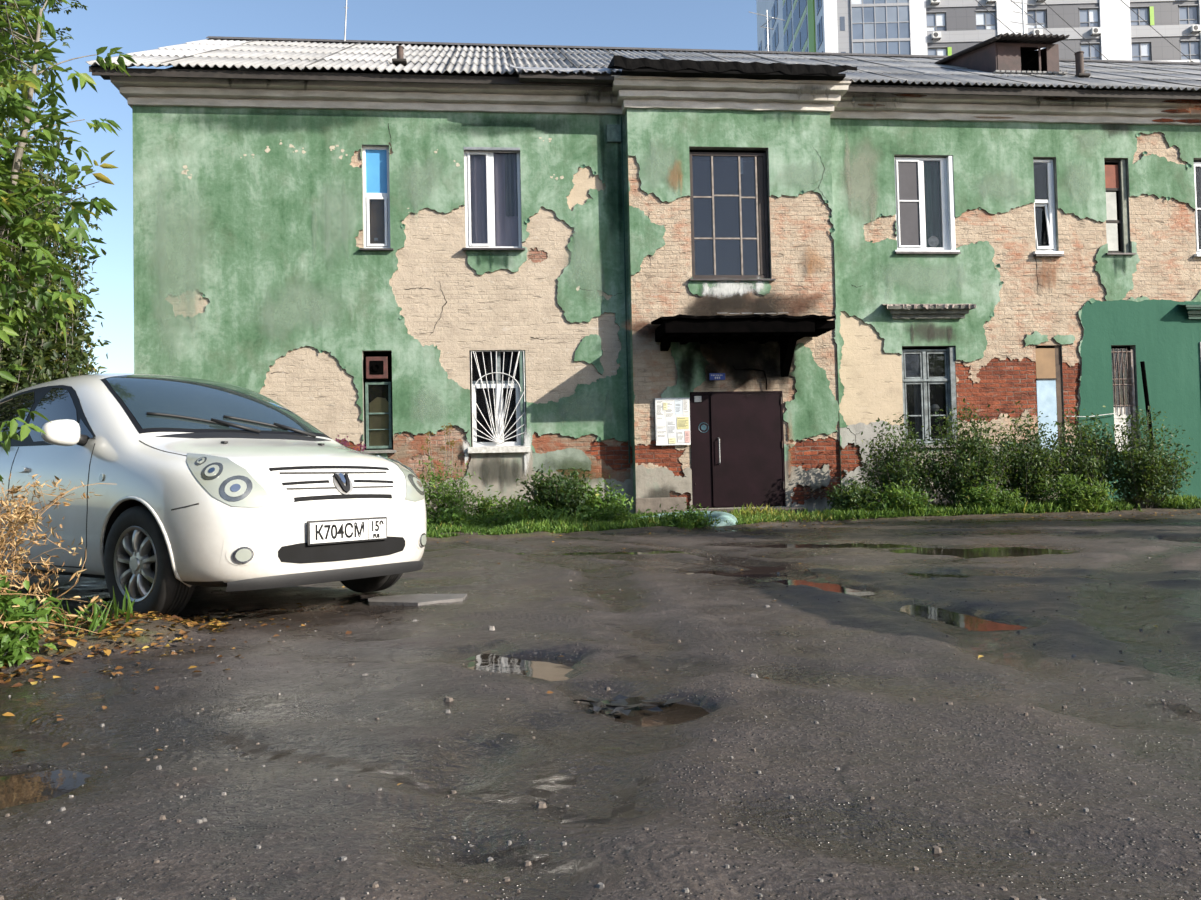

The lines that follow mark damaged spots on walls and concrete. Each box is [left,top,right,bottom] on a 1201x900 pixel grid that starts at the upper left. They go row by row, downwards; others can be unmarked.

flaking render [1132,99,1201,168]
spalling [355,230,363,248]
flaking render [1122,194,1201,302]
flaking render [166,289,210,319]
flaking render [259,346,364,451]
crack [405,283,447,335]
flaking render [387,155,911,510]
damp [679,341,795,390]
damp [690,278,818,316]
flaking render [955,203,1107,446]